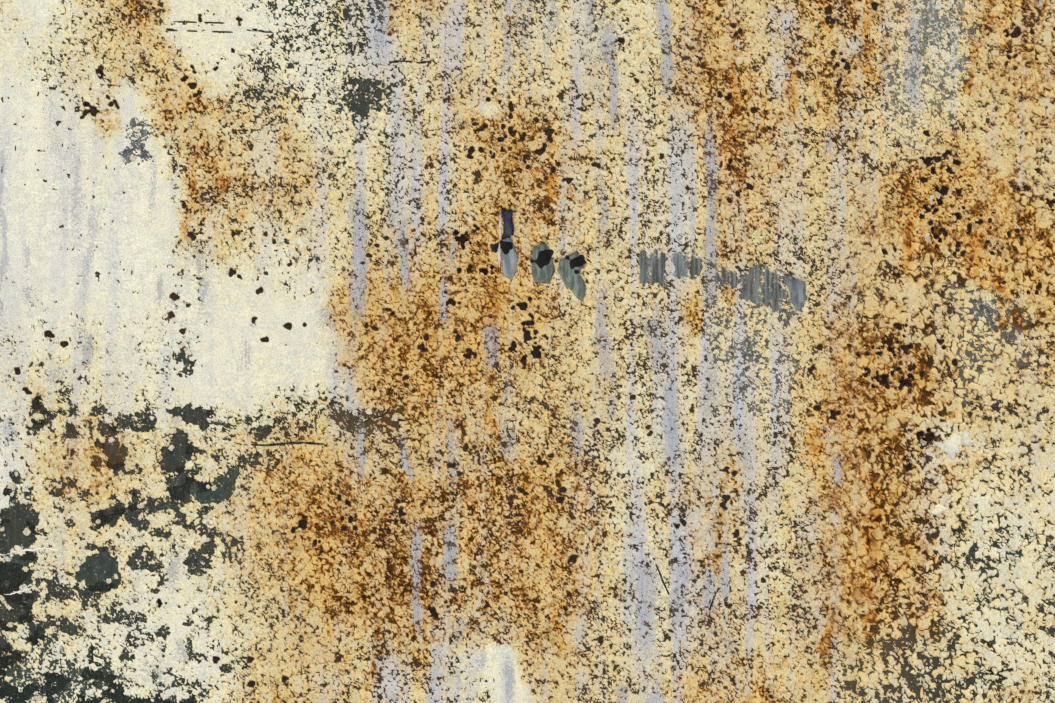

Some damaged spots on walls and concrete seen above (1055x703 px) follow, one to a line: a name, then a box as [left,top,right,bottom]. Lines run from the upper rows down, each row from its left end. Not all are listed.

peeling [235,0,394,50]
damp [656,0,675,103]
damp [345,177,369,321]
damp [438,224,460,329]
damp [632,112,789,321]
spalling [44,330,69,348]
damp [483,318,500,370]
spalling [530,453,554,465]
peeling [0,386,406,703]
damp [409,518,423,644]
damp [441,522,458,588]
damp [634,555,689,660]